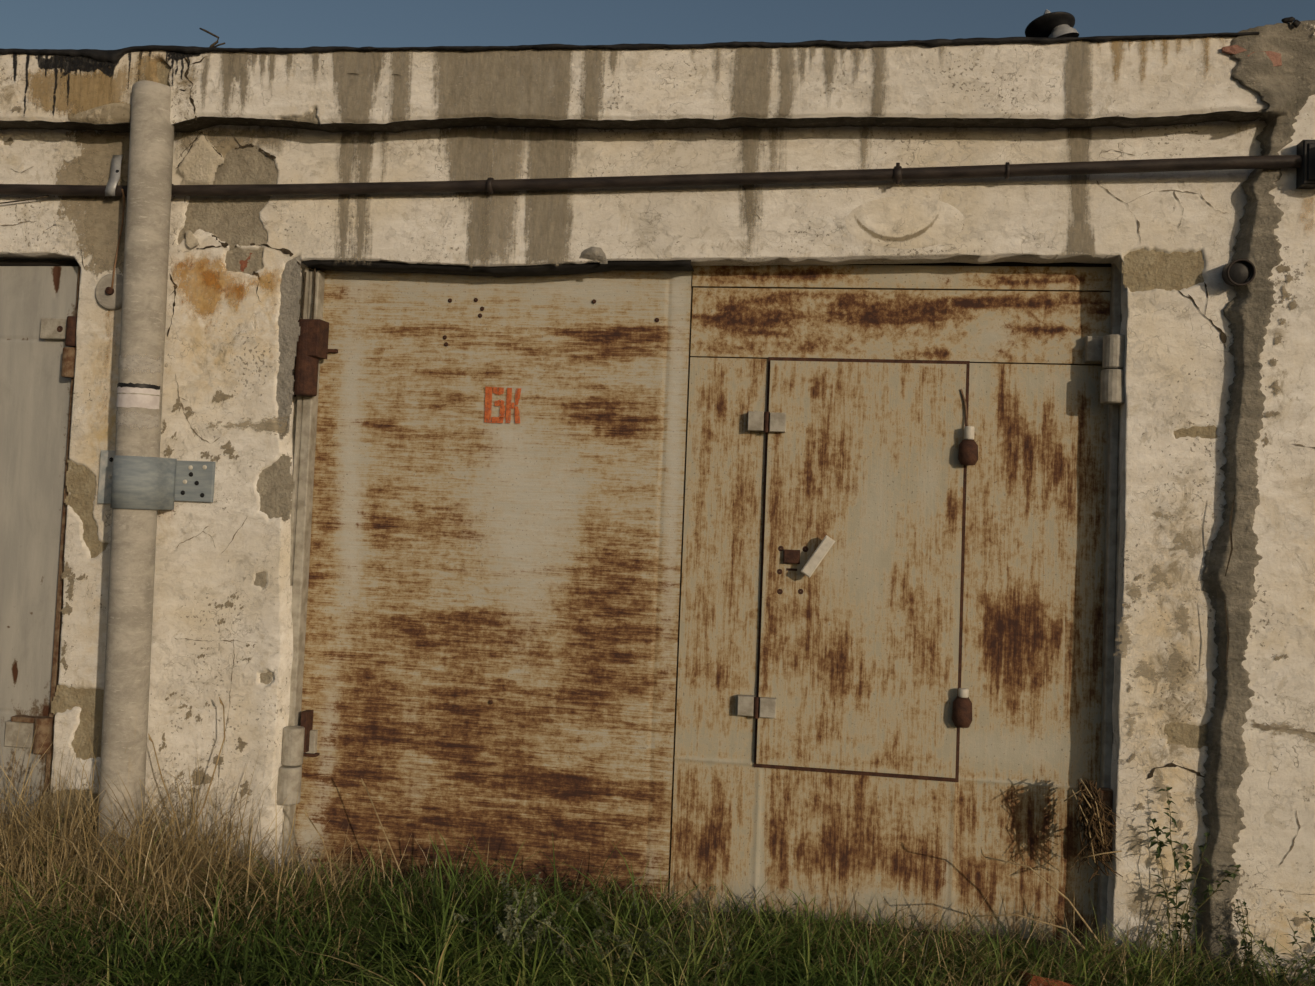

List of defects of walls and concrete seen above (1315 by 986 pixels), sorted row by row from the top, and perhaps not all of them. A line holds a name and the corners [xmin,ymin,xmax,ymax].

leakage [53,130,130,276]
spalling [178,146,278,275]
spalling [201,255,302,520]
leakage [313,51,412,262]
leakage [434,49,617,266]
leakage [715,46,886,251]
leakage [1065,36,1222,257]
spalling [1122,248,1204,292]
crack [1179,282,1227,348]
spalling [64,459,109,558]
crack [1224,495,1235,671]
spalling [51,641,104,760]